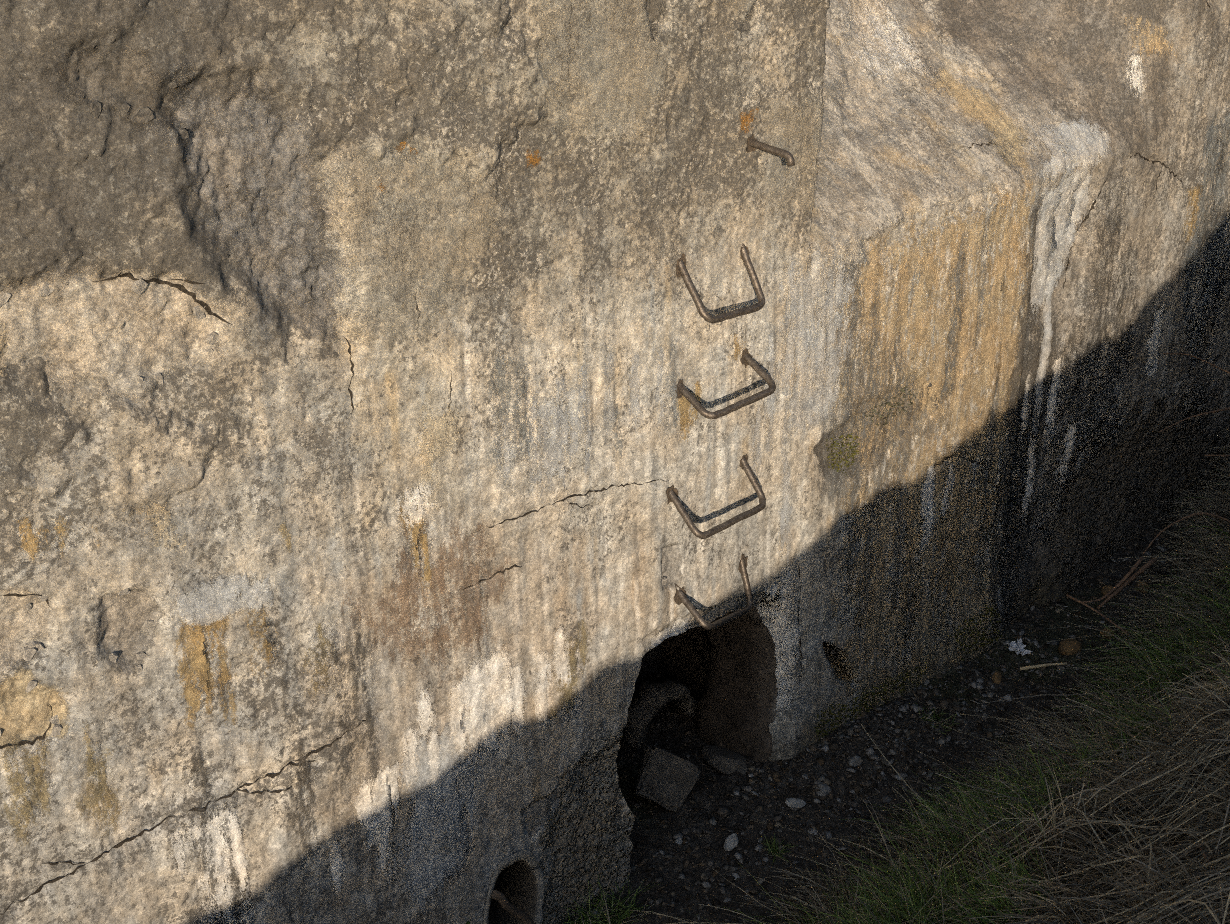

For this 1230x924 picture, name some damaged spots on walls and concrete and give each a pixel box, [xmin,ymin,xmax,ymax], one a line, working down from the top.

crack [92,272,232,325]
leakage [851,2,1230,639]
crack [472,479,666,534]
crack [933,454,1000,530]
crack [0,594,56,614]
crack [465,565,522,589]
spalling [0,587,69,754]
crack [0,704,383,915]
spalling [521,727,635,924]